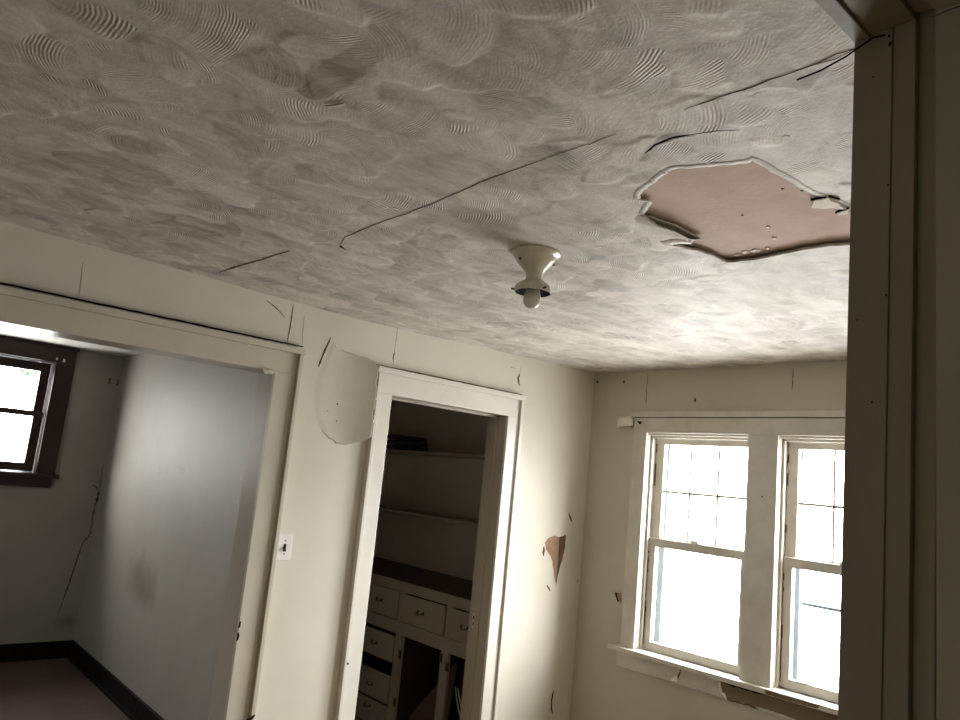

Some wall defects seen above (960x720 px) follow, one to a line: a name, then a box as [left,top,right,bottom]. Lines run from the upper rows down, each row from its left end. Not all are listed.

crack [684,48,855,110]
crack [340,134,617,250]
flaking render [633,156,851,263]
crack [221,251,289,272]
crack [0,264,304,347]
crack [58,465,104,614]
peeling [542,533,567,591]
peeling [718,681,838,720]